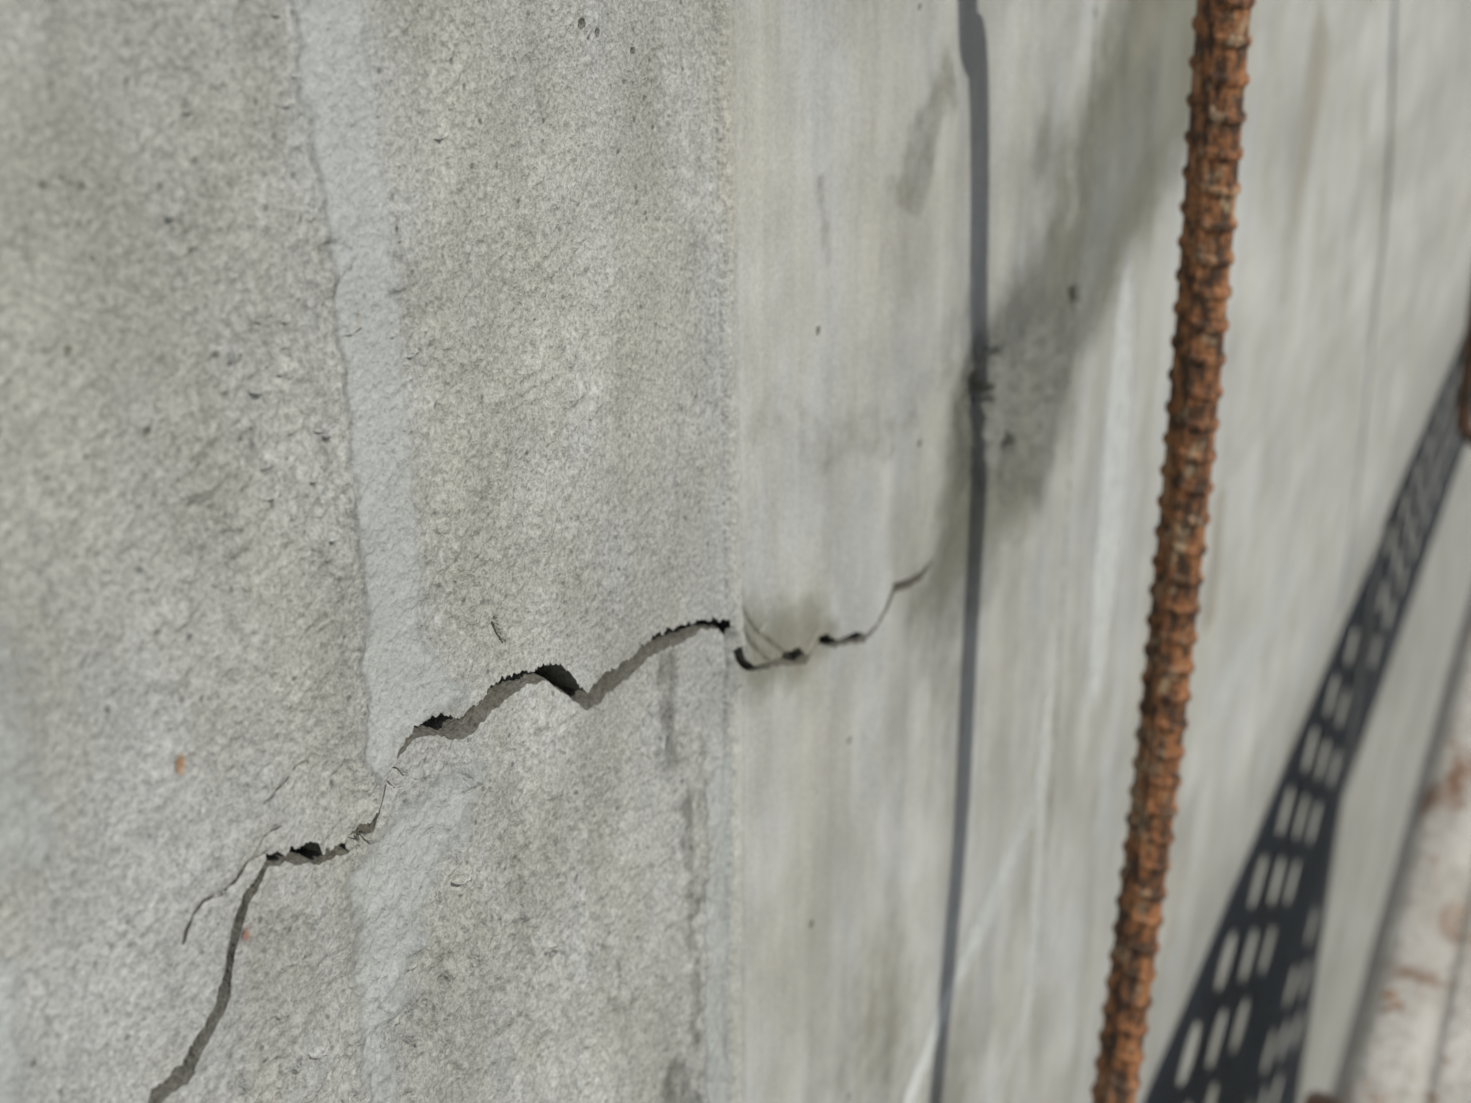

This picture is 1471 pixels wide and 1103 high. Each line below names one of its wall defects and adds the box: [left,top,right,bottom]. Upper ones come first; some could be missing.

water stain [930,0,1197,697]
crack [148,524,951,1103]